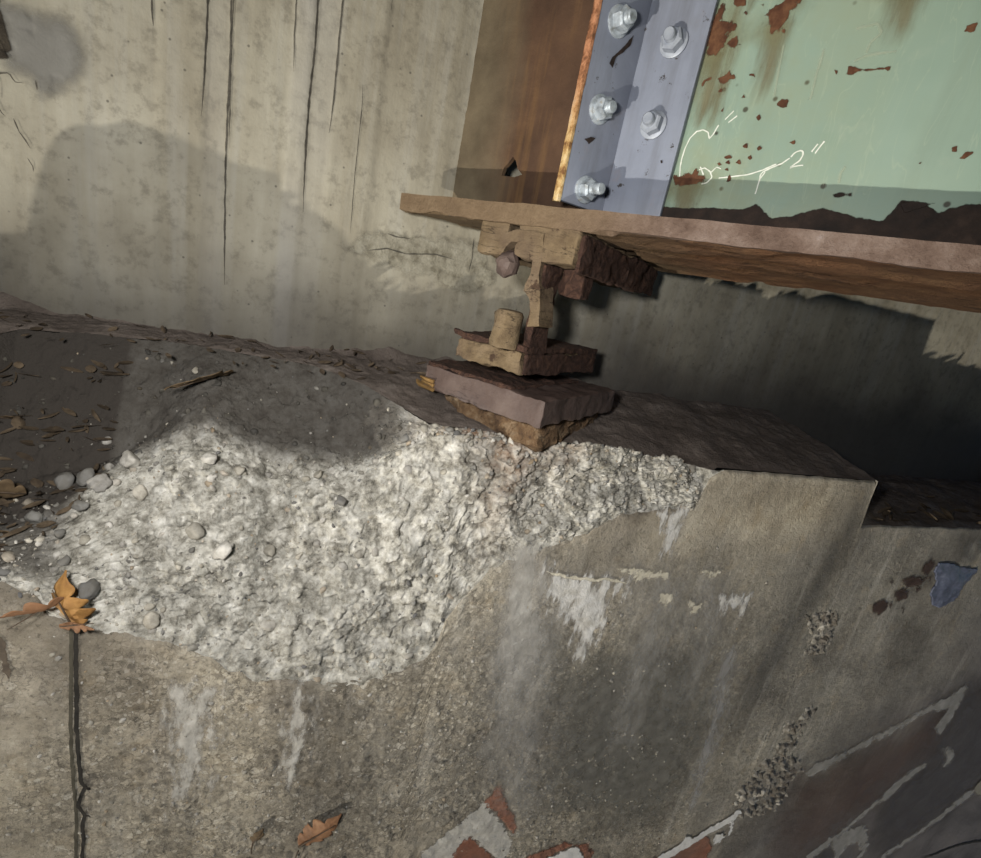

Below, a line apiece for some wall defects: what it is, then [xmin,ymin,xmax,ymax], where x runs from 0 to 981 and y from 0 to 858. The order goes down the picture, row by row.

corrosion [701,0,747,115]
corrosion [749,0,801,78]
corrosion [834,66,890,75]
crack [0,110,34,172]
corrosion [717,143,762,182]
spalling [0,329,724,687]
corrosion [872,560,934,615]
spalling [804,610,838,656]
crack [68,629,91,858]
spalling [734,704,817,819]